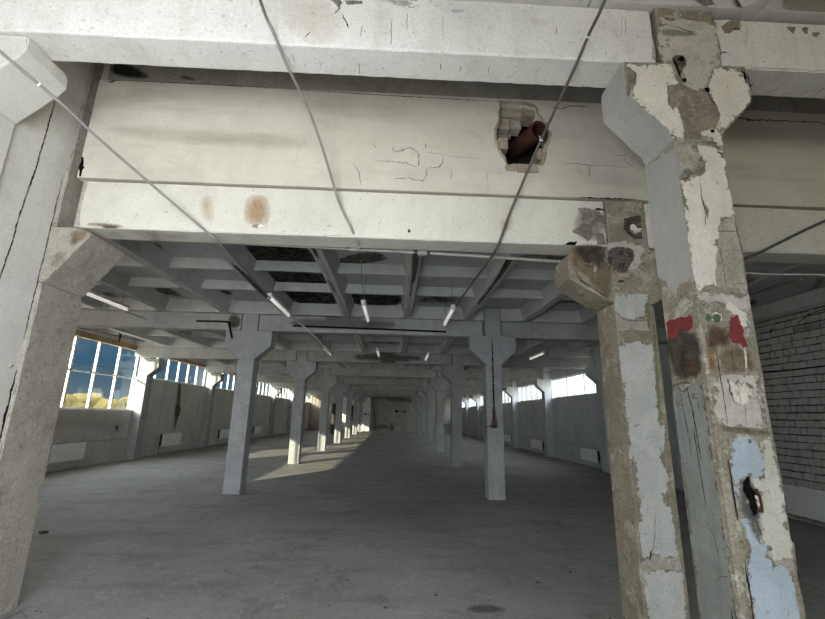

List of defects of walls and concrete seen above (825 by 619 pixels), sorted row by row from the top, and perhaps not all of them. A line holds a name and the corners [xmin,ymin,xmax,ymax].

peeling [787,26,820,37]
crack [0,101,56,278]
rust [251,201,264,220]
crack [373,143,488,182]
spalling [494,100,552,173]
flaking render [564,17,752,331]
crack [23,178,63,340]
leakage [666,331,700,379]
crack [0,370,17,439]
peeling [619,341,688,619]
peeling [672,350,806,619]